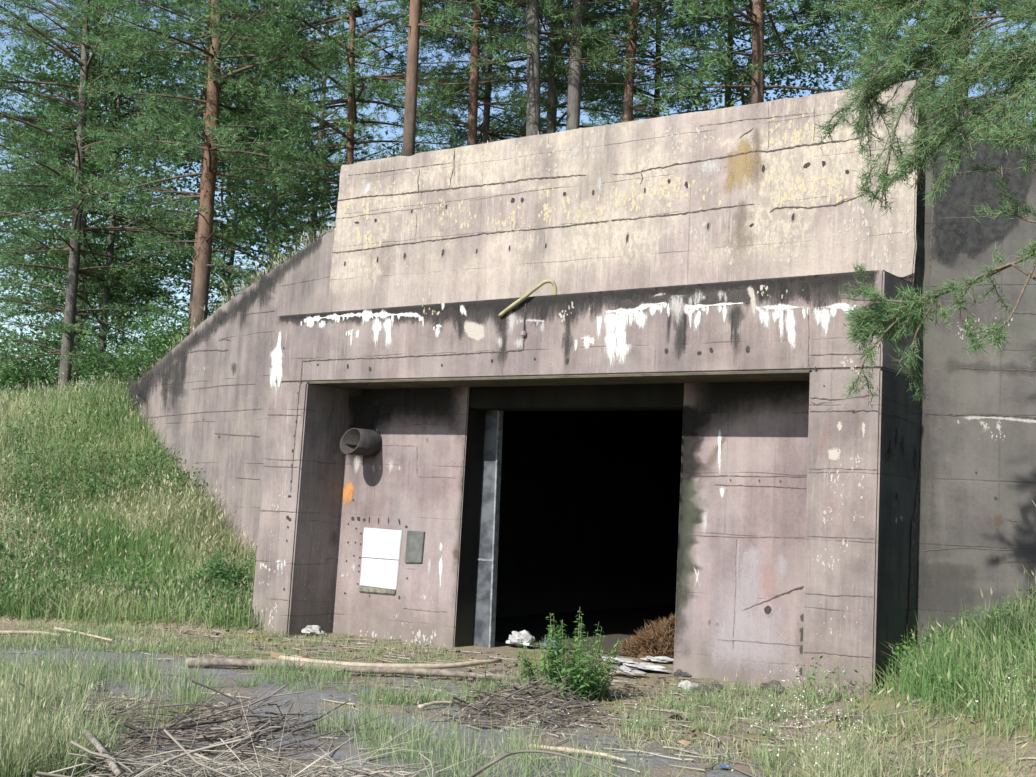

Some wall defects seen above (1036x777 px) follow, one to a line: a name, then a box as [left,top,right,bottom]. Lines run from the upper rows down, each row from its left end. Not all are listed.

water stain [916,118,1035,263]
water stain [125,238,322,412]
water stain [270,270,875,389]
water stain [898,252,922,297]
rust [342,482,354,505]